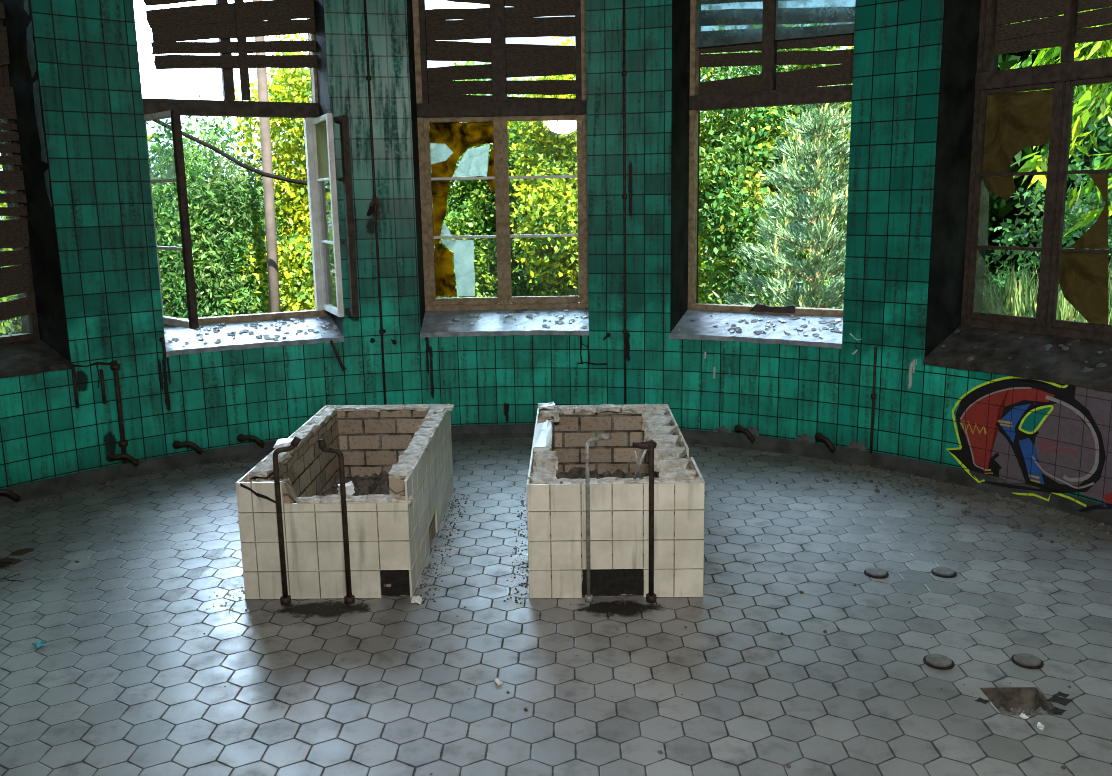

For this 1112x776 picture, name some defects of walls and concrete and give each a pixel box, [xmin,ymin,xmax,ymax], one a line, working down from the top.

spalling [975,687,1073,719]